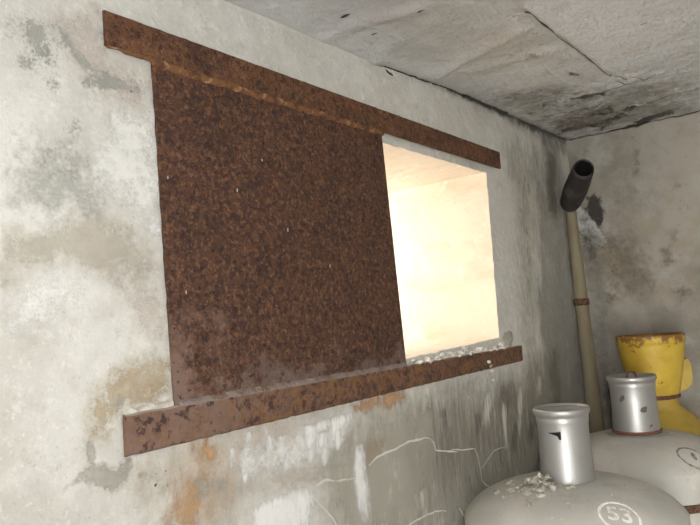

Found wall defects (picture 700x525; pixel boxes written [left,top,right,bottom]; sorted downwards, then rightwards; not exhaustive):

leakage [21,20,49,69]
crack [525,11,656,85]
leakage [505,87,679,129]
leakage [92,363,167,433]
rust [353,391,404,411]
leakage [253,489,314,525]
leakage [230,413,352,482]
crack [312,478,354,525]
leakage [354,446,370,521]
crack [409,508,464,525]
crack [368,437,508,487]